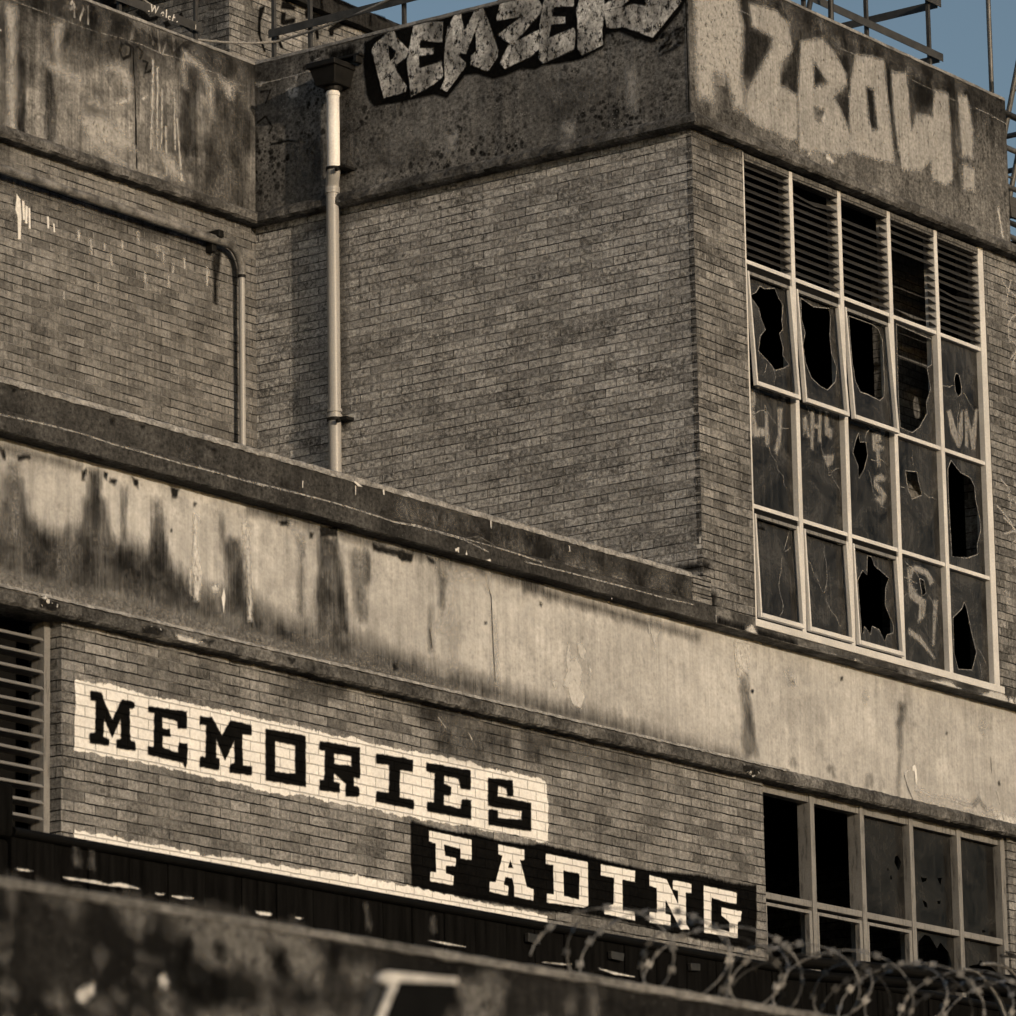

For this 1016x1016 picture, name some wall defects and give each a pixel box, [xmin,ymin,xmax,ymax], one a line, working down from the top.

water stain [7,7,24,132]
water stain [35,0,247,208]
water stain [4,182,158,240]
water stain [0,466,709,742]
flaking render [553,643,591,707]